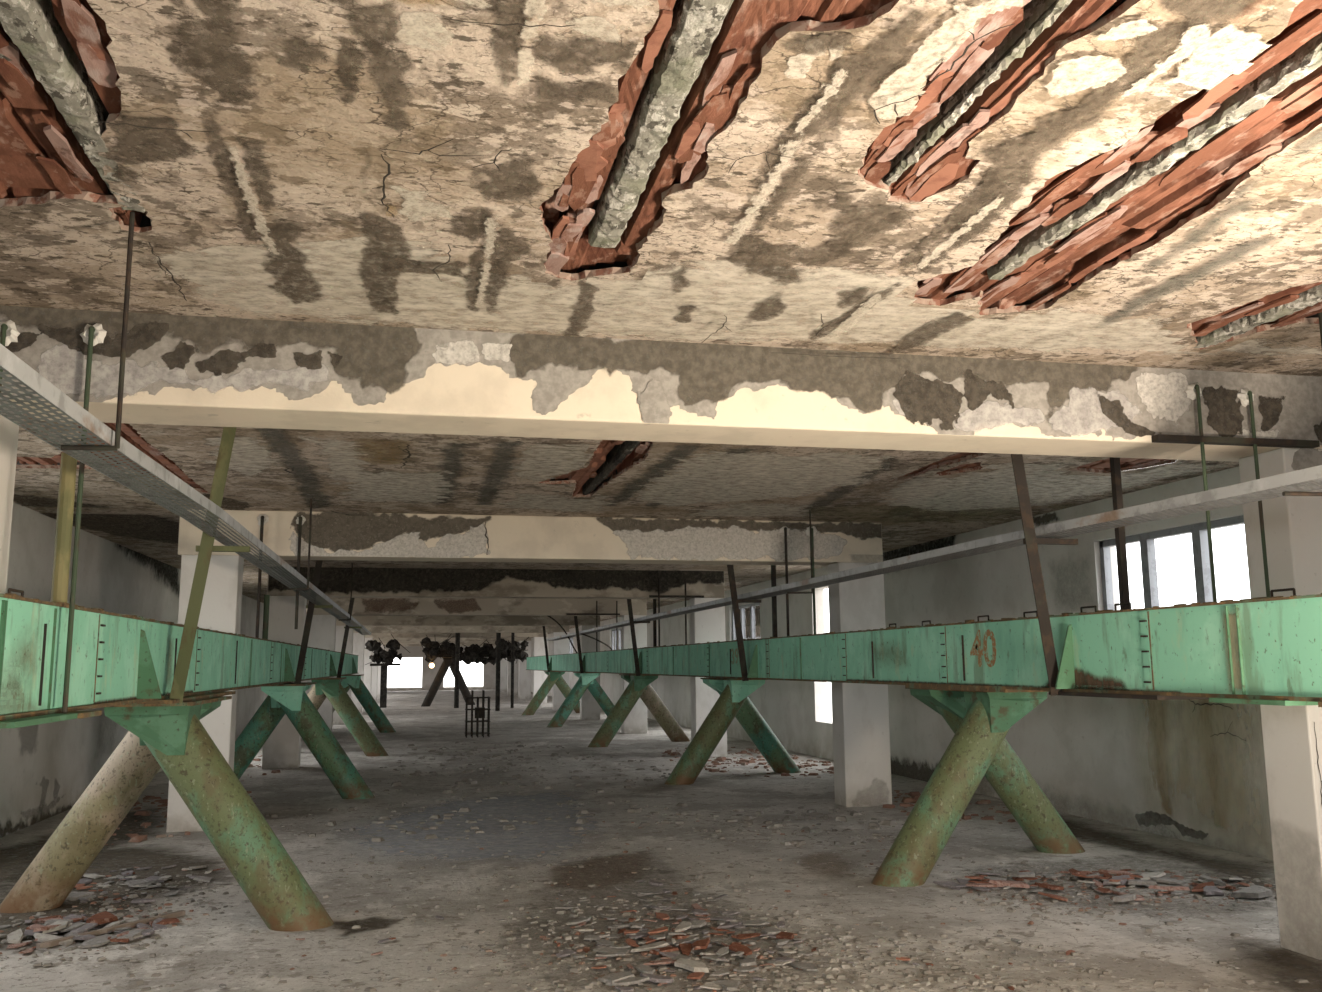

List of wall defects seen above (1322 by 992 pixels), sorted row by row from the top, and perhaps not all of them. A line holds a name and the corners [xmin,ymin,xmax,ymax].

spalling [0,0,152,233]
crack [372,139,511,218]
leakage [0,0,1322,439]
spalling [539,0,899,281]
spalling [857,0,1140,203]
spalling [914,0,1322,315]
spalling [1187,282,1322,350]
peeling [66,332,387,406]
peeling [404,328,792,424]
peeling [1092,367,1322,470]
leakage [1314,421,1322,443]
crack [1314,722,1322,804]